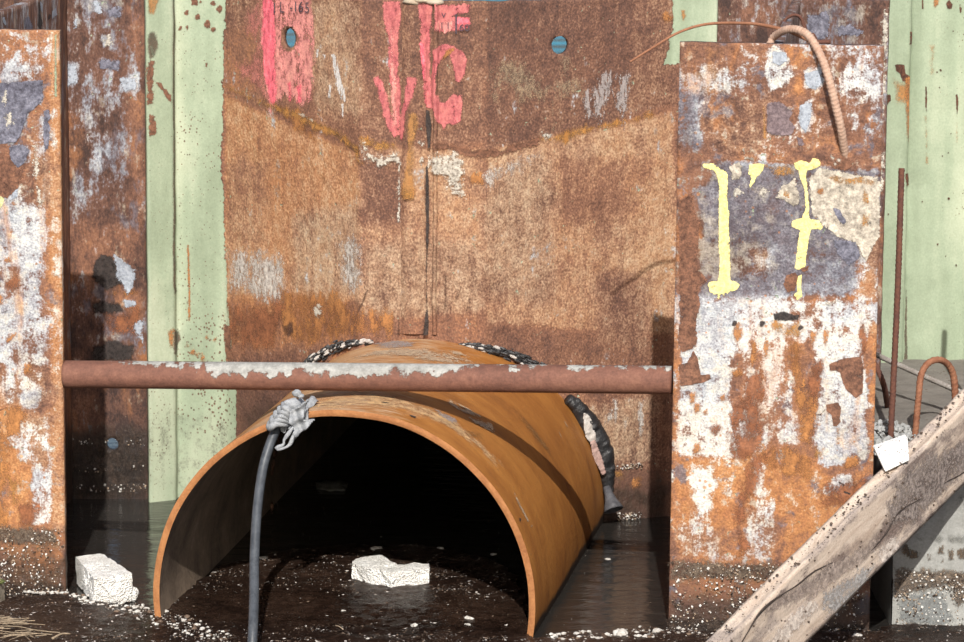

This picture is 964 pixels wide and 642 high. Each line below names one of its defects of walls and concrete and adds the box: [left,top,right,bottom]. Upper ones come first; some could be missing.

peeling [0,34,77,206]
rust [0,153,26,205]
rust [826,153,852,171]
rust [0,276,19,304]
rust [92,289,140,361]
rust [169,330,205,360]
rust [206,285,394,362]
rust [677,193,711,415]
rust [784,266,809,292]
rust [0,406,40,528]
rust [711,311,867,556]